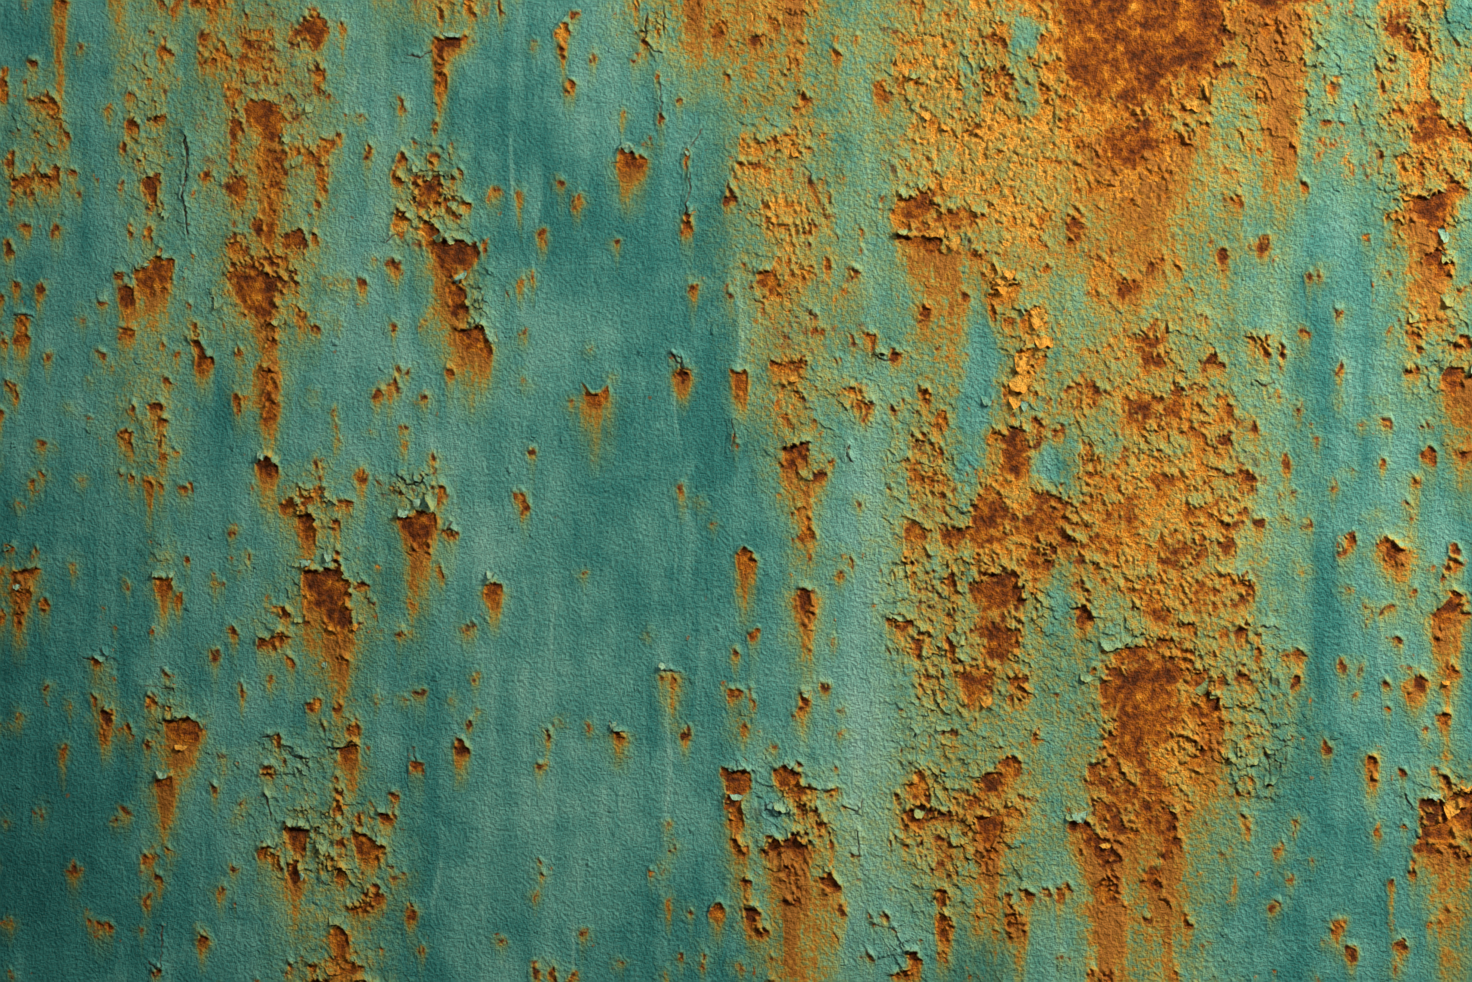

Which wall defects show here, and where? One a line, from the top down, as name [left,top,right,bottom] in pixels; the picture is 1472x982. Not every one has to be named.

crack [175,123,199,249]
spalling [366,204,516,427]
spalling [862,188,1070,416]
corrosion [0,0,596,982]